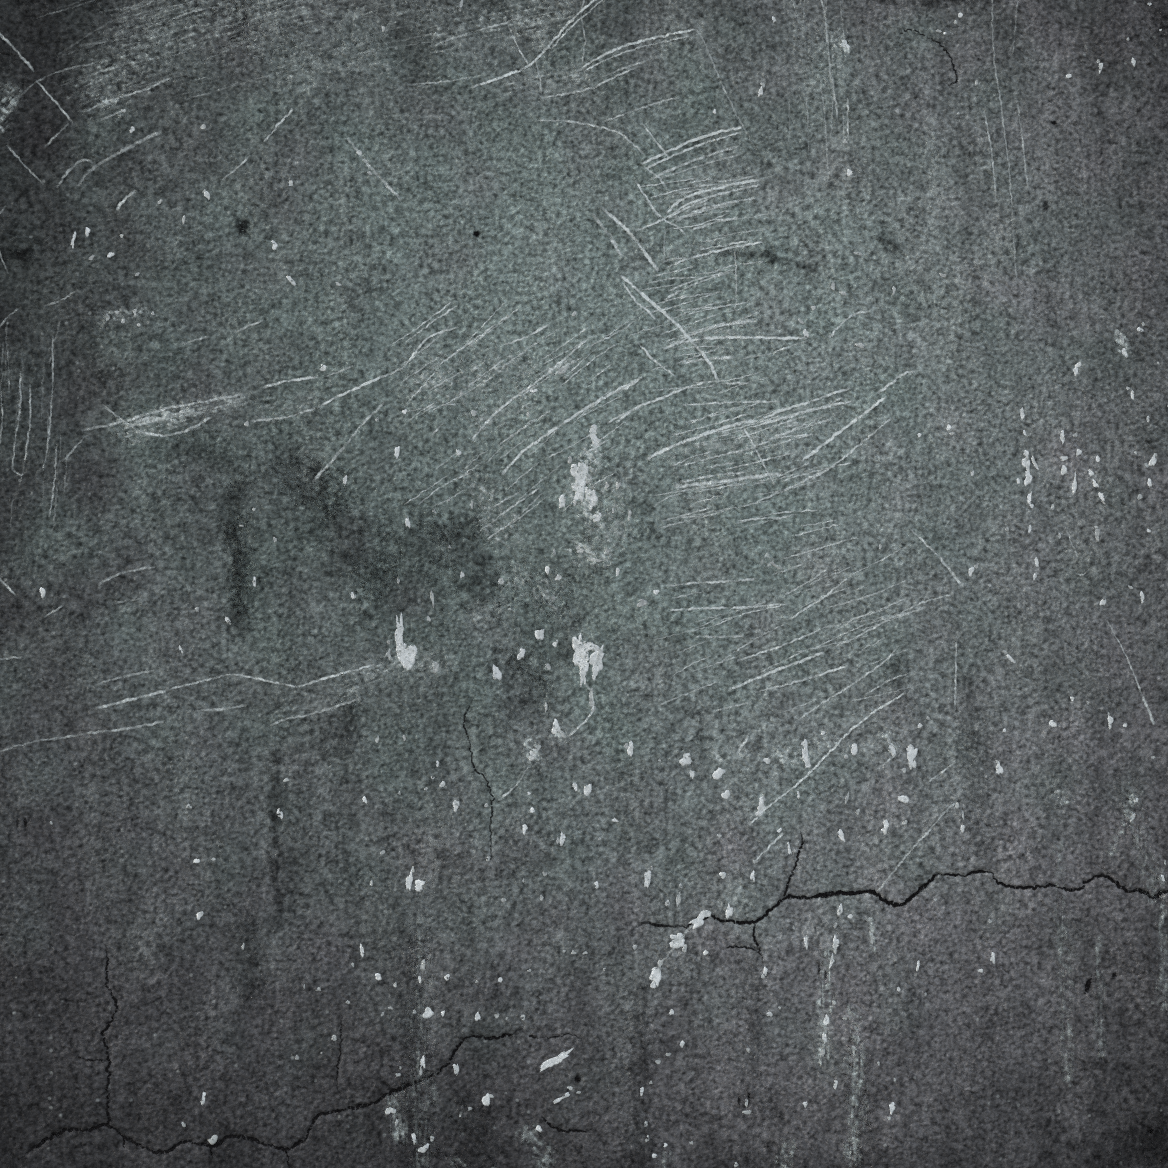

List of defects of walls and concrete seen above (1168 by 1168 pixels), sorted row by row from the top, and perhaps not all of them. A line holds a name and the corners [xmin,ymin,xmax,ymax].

crack [643,834,1168,962]
crack [28,957,578,1168]